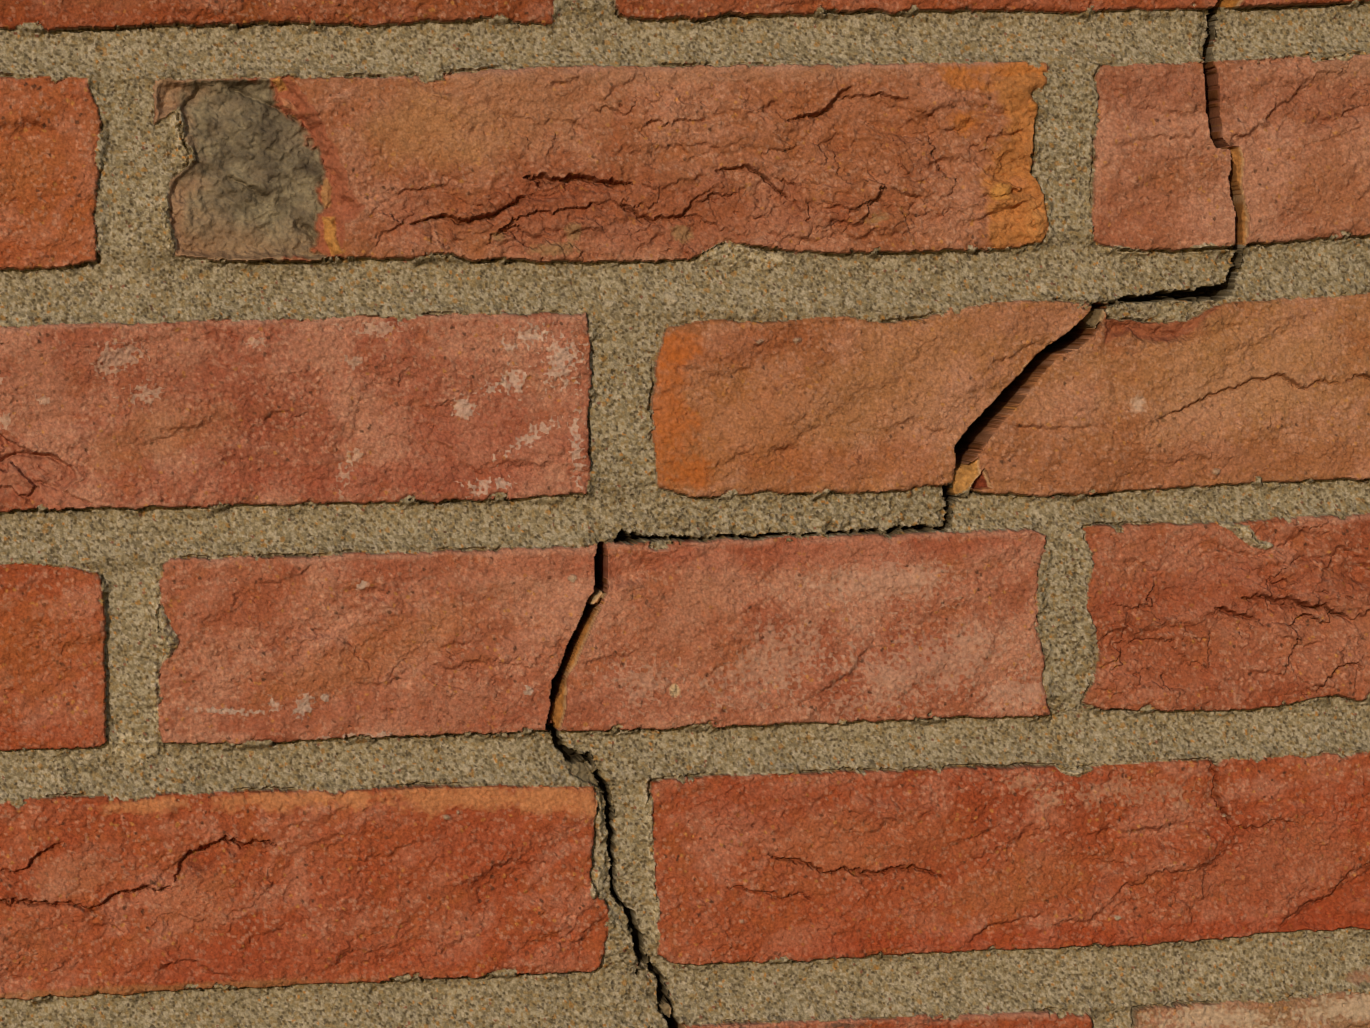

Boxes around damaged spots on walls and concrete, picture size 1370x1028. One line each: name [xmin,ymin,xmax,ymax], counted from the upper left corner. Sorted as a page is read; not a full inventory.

spalling [153,76,366,263]
crack [411,164,789,226]
crack [546,0,1251,1028]
crack [1214,594,1344,621]
crack [1316,663,1363,693]
crack [1208,760,1301,830]